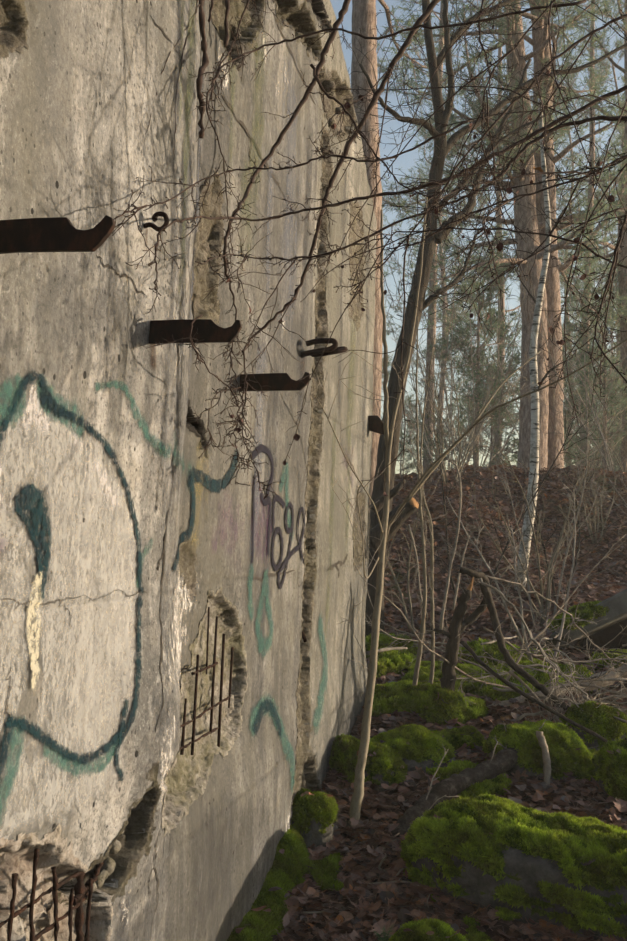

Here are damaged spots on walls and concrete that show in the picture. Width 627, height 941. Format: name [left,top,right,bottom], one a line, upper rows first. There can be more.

spalling [0,0,29,59]
spalling [191,170,224,324]
crack [1,343,208,732]
spalling [209,0,357,825]
spalling [159,538,248,837]
spalling [0,824,128,941]